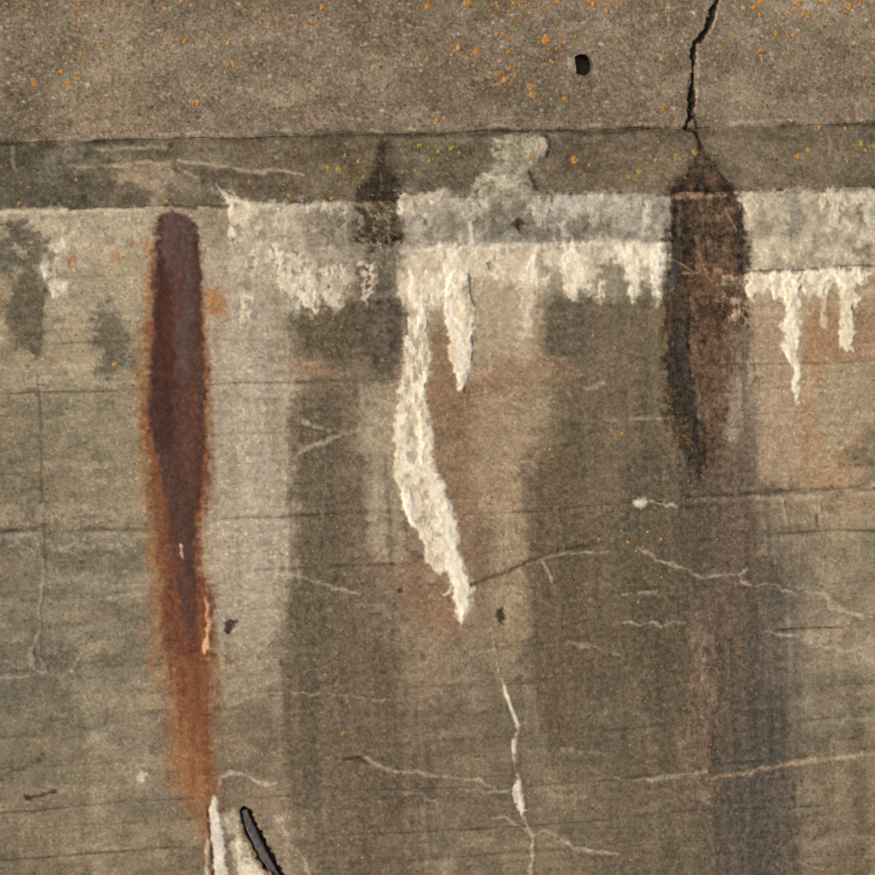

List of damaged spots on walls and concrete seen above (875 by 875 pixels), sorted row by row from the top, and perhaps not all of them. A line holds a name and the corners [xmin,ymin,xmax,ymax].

crack [683,0,721,153]
leakage [0,200,165,360]
rust [109,208,232,875]
crack [246,569,388,609]
leakage [196,130,875,875]
crack [635,545,875,678]
crack [224,690,395,705]
crack [326,621,847,875]
spalling [221,805,288,875]